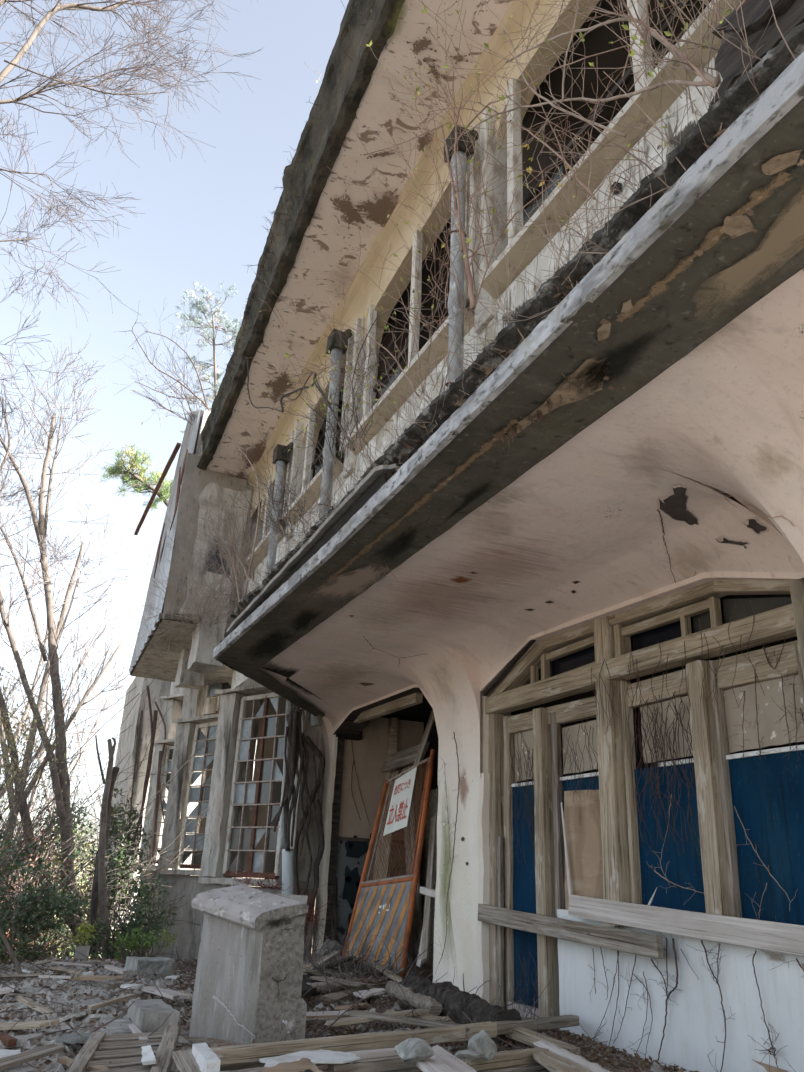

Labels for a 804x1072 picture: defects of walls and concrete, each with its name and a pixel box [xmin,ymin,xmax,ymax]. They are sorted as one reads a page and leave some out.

spalling [762,150,802,175]
spalling [721,208,757,238]
spalling [597,299,633,344]
spalling [501,358,614,446]
rust [326,419,519,582]
peeling [657,485,699,525]
crack [644,457,795,527]
crack [657,510,676,583]
peeling [715,516,769,549]